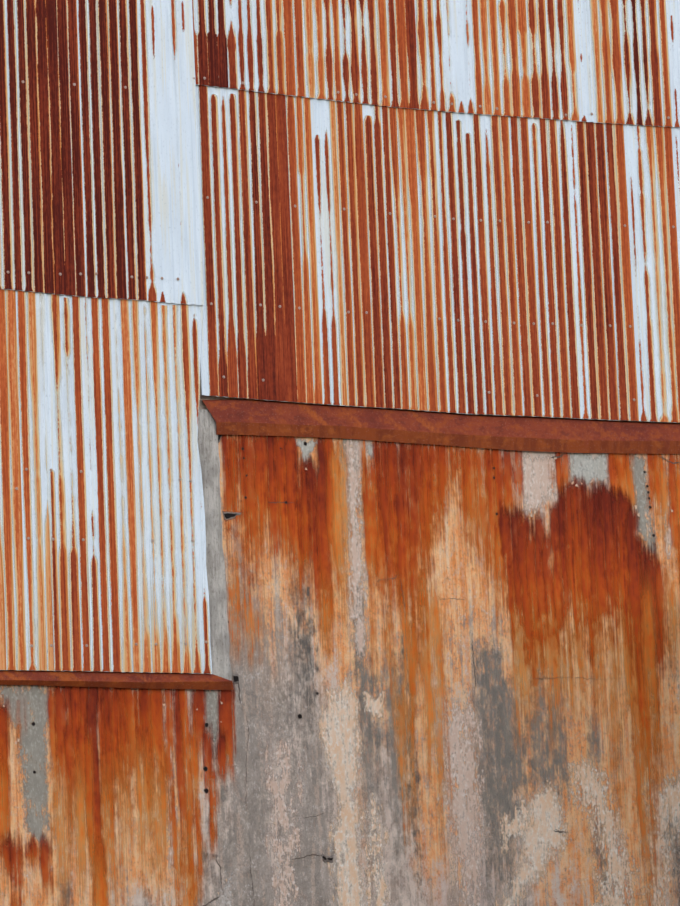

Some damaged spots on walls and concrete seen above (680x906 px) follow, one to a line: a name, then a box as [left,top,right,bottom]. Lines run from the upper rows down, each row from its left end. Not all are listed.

corrosion [0,0,680,674]
corrosion [0,686,235,906]
crack [194,854,224,906]
corrosion [362,440,680,879]